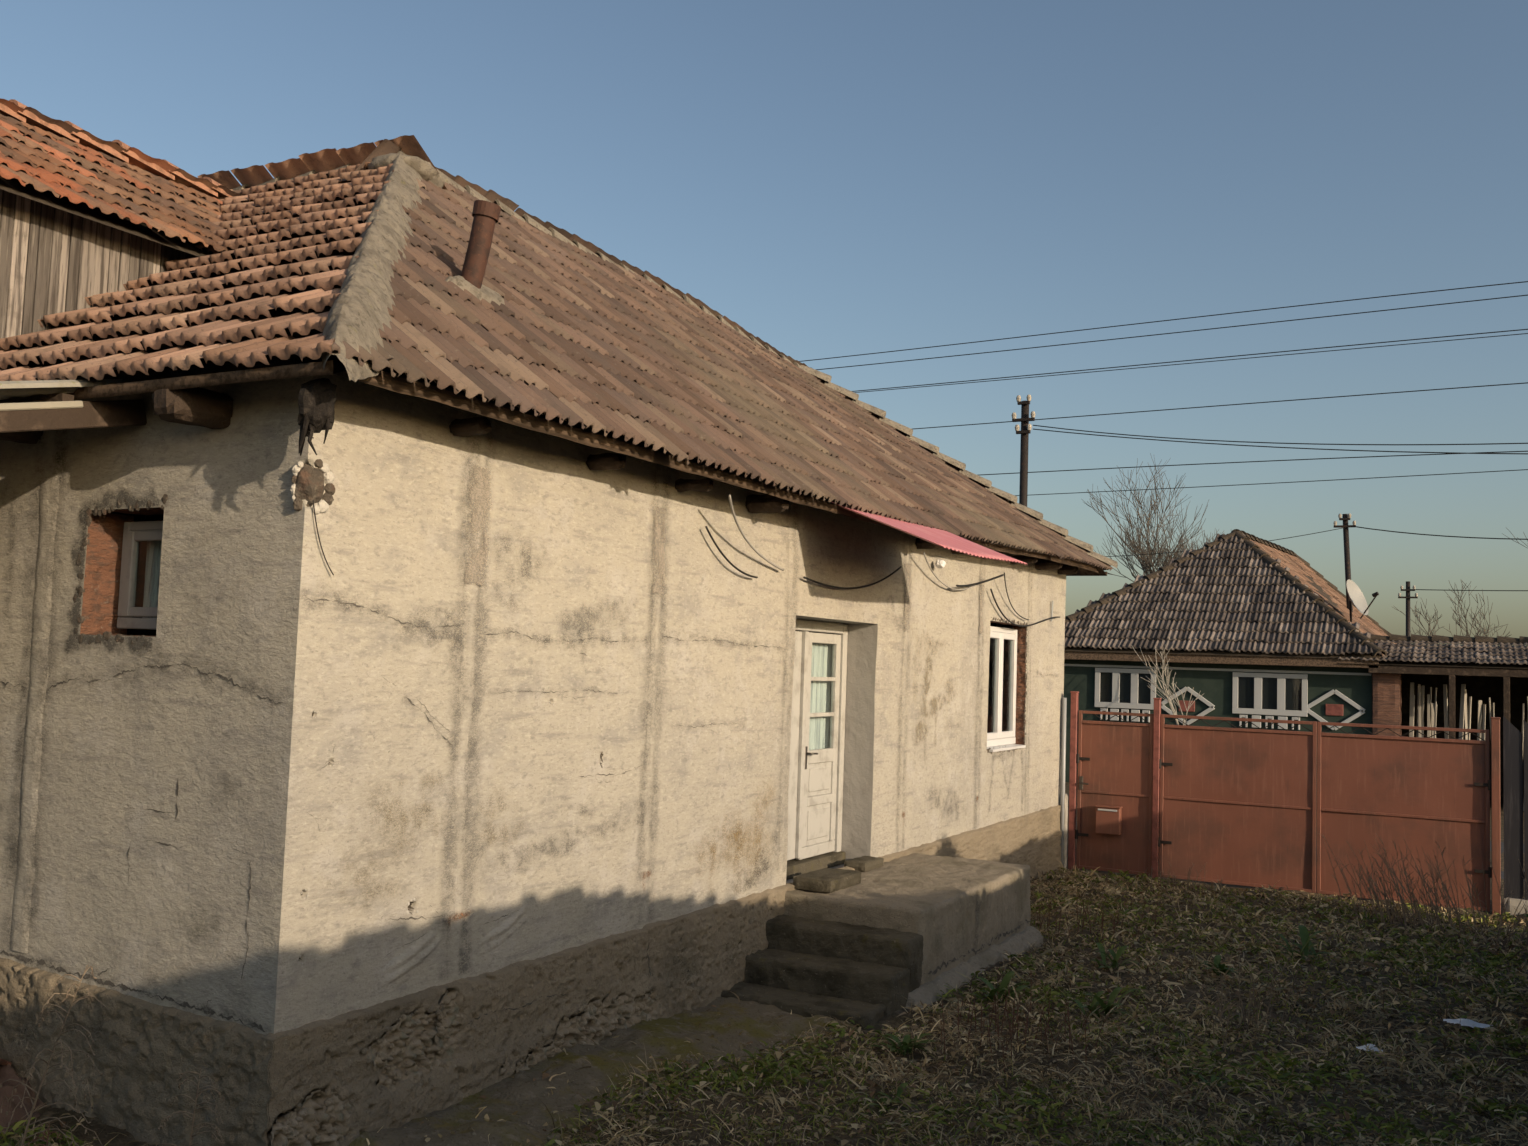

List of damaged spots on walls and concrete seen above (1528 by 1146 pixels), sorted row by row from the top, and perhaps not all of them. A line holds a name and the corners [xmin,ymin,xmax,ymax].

crack [0,656,286,704]
spalling [361,1002,463,1094]
spalling [267,1087,352,1146]